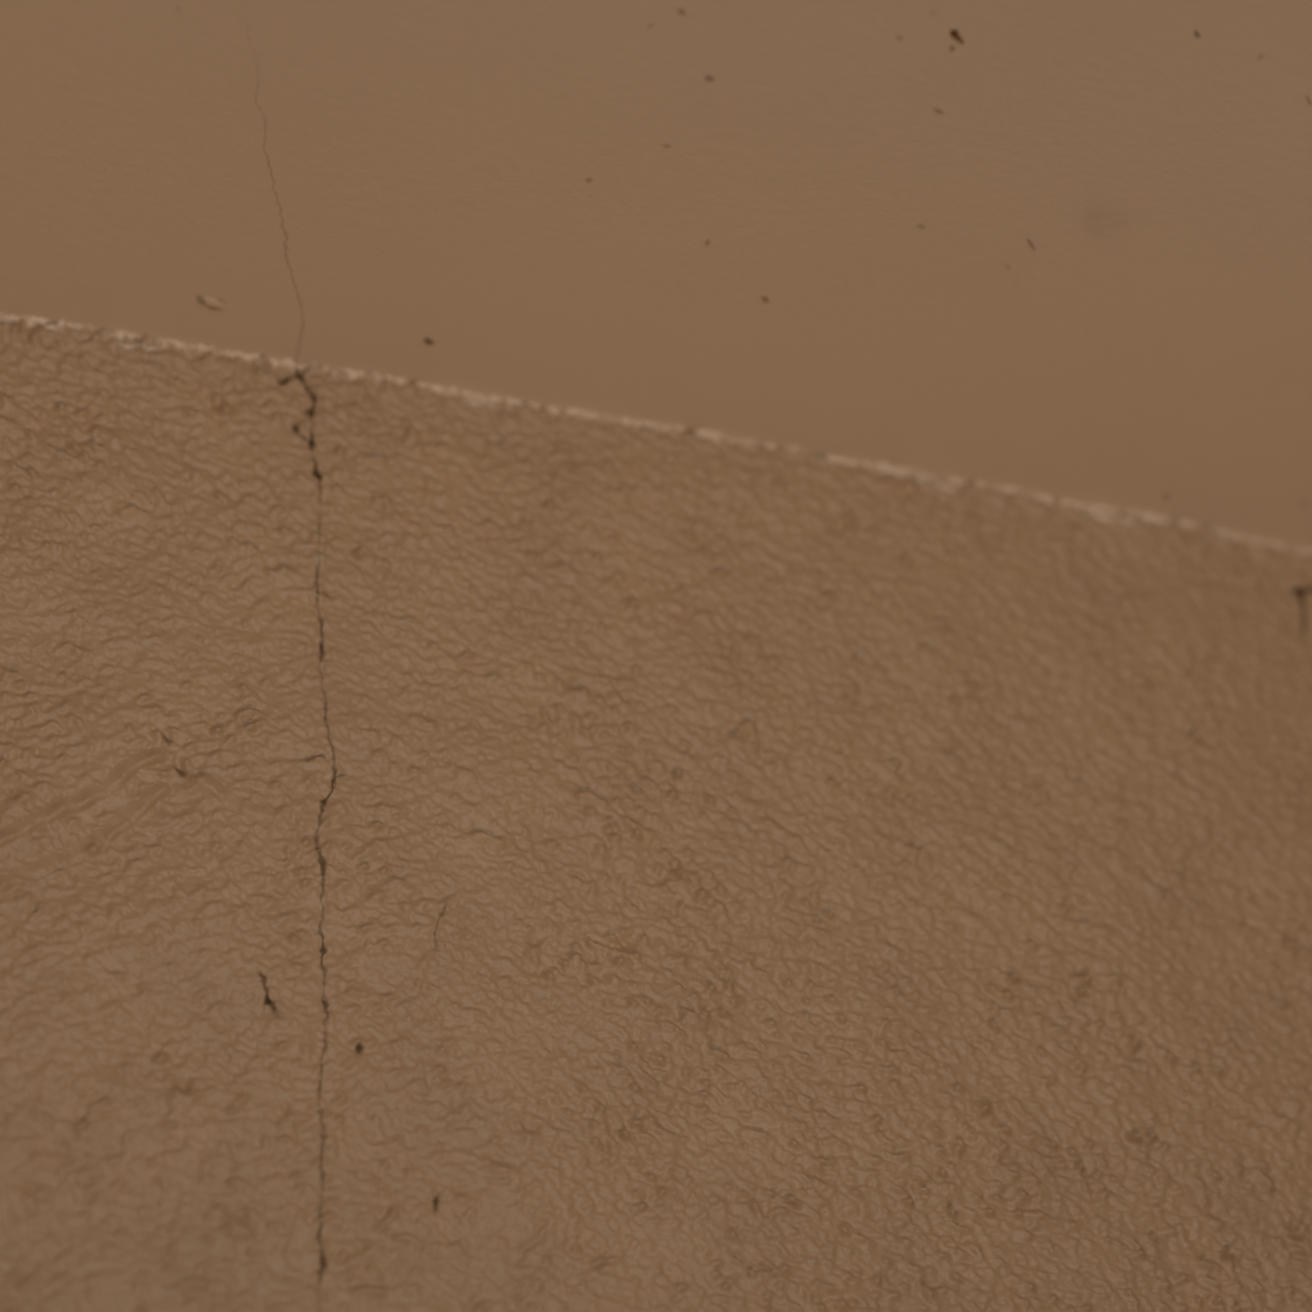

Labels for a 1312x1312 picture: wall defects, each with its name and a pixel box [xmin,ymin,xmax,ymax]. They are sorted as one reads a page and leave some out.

crack [280,371,322,480]